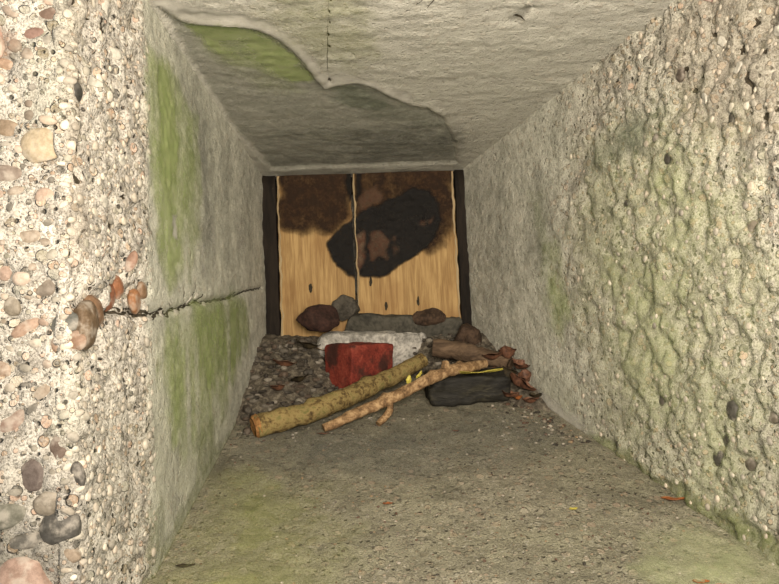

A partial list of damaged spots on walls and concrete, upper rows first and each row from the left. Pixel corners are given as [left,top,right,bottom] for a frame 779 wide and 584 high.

leakage [153,0,413,103]
crack [325,0,333,82]
crack [104,286,261,321]